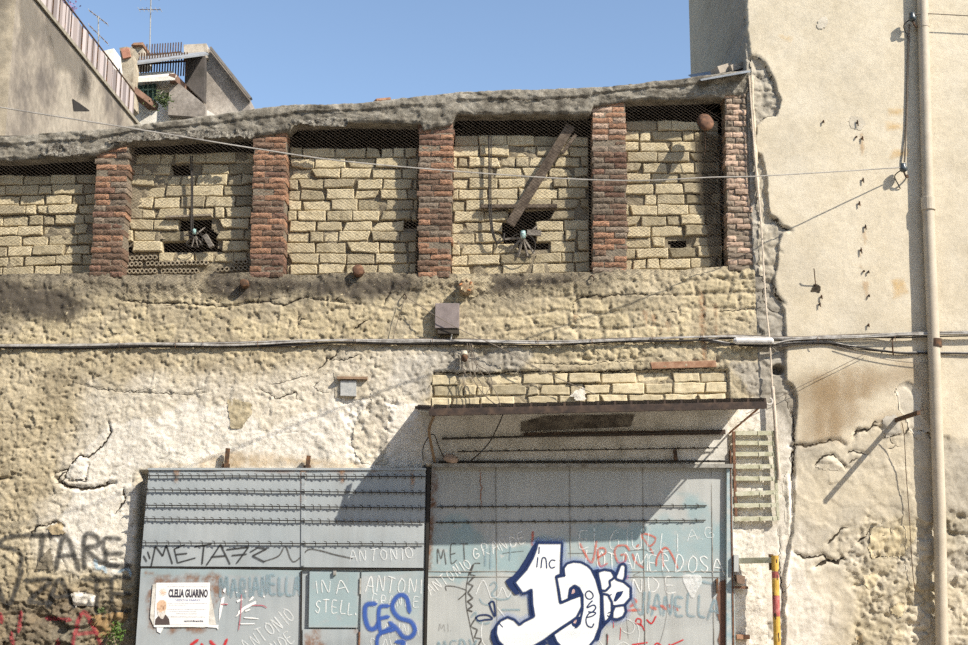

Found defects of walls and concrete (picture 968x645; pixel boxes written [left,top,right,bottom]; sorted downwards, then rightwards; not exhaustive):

spalling [750,58,783,121]
spalling [756,153,779,288]
spalling [227,398,252,429]
peeling [883,382,930,441]
crack [56,422,126,514]
spalling [868,526,917,559]
spalling [863,572,878,589]